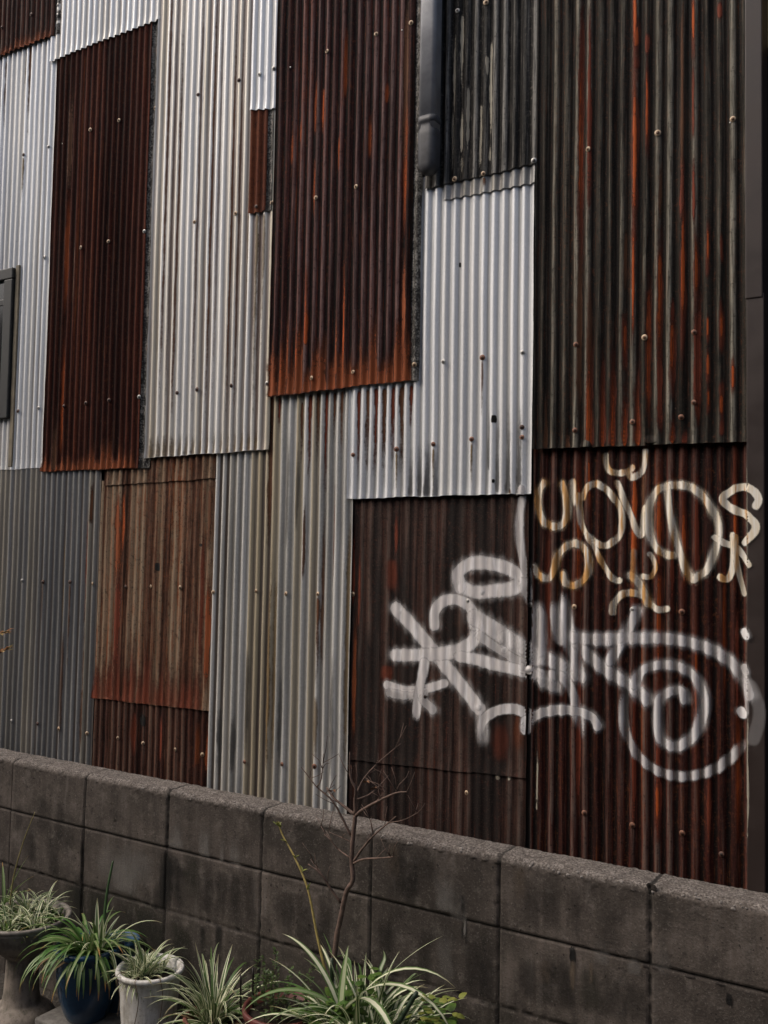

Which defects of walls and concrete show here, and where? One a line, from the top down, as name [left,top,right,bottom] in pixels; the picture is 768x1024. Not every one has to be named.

corrosion [40,427,135,472]
corrosion [565,0,735,816]
corrosion [80,485,213,752]
corrosion [316,535,325,666]
corrosion [344,529,361,734]
corrosion [722,448,742,837]
corrosion [655,725,663,842]